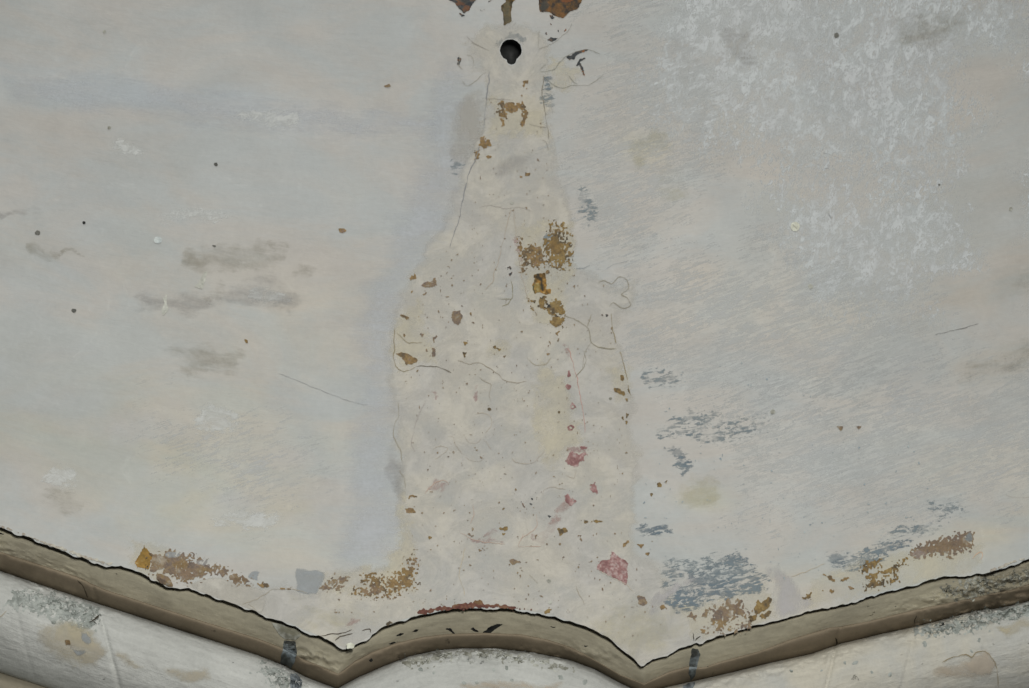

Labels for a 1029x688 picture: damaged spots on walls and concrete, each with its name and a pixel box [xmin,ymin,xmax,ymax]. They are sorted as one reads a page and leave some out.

peeling [135,15,772,664]
crack [393,314,631,425]
peeling [802,519,975,600]
peeling [913,558,1029,639]
peeling [402,648,575,673]